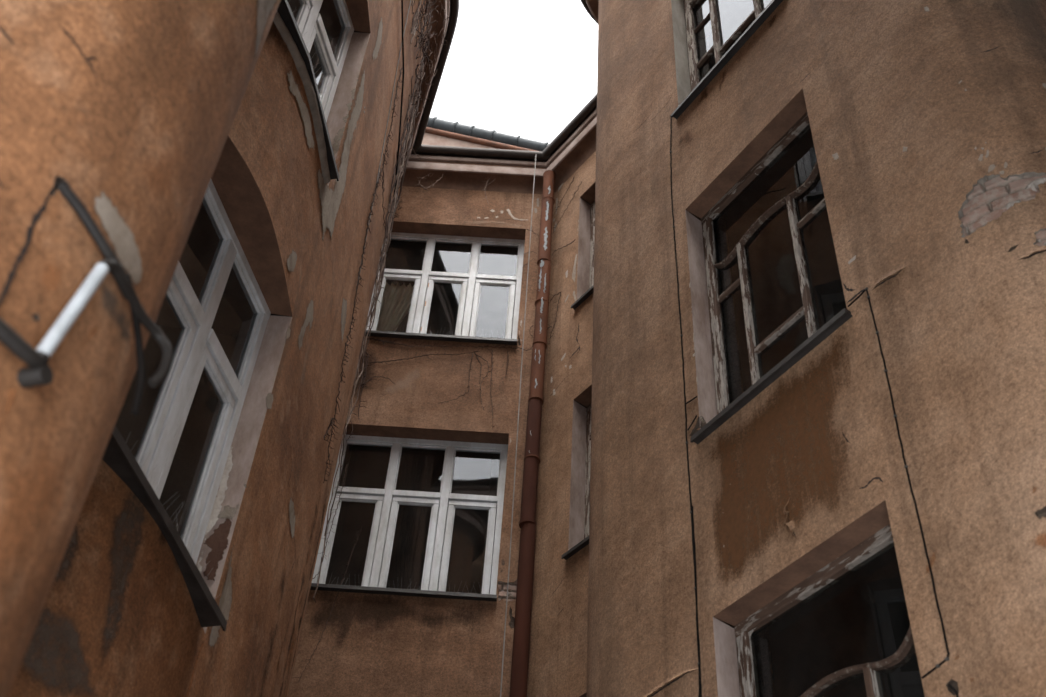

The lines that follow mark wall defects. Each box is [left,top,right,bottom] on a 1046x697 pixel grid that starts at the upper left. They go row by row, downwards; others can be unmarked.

spalling [958,142,1046,244]
peeling [197,447,234,581]
leakage [713,338,847,583]